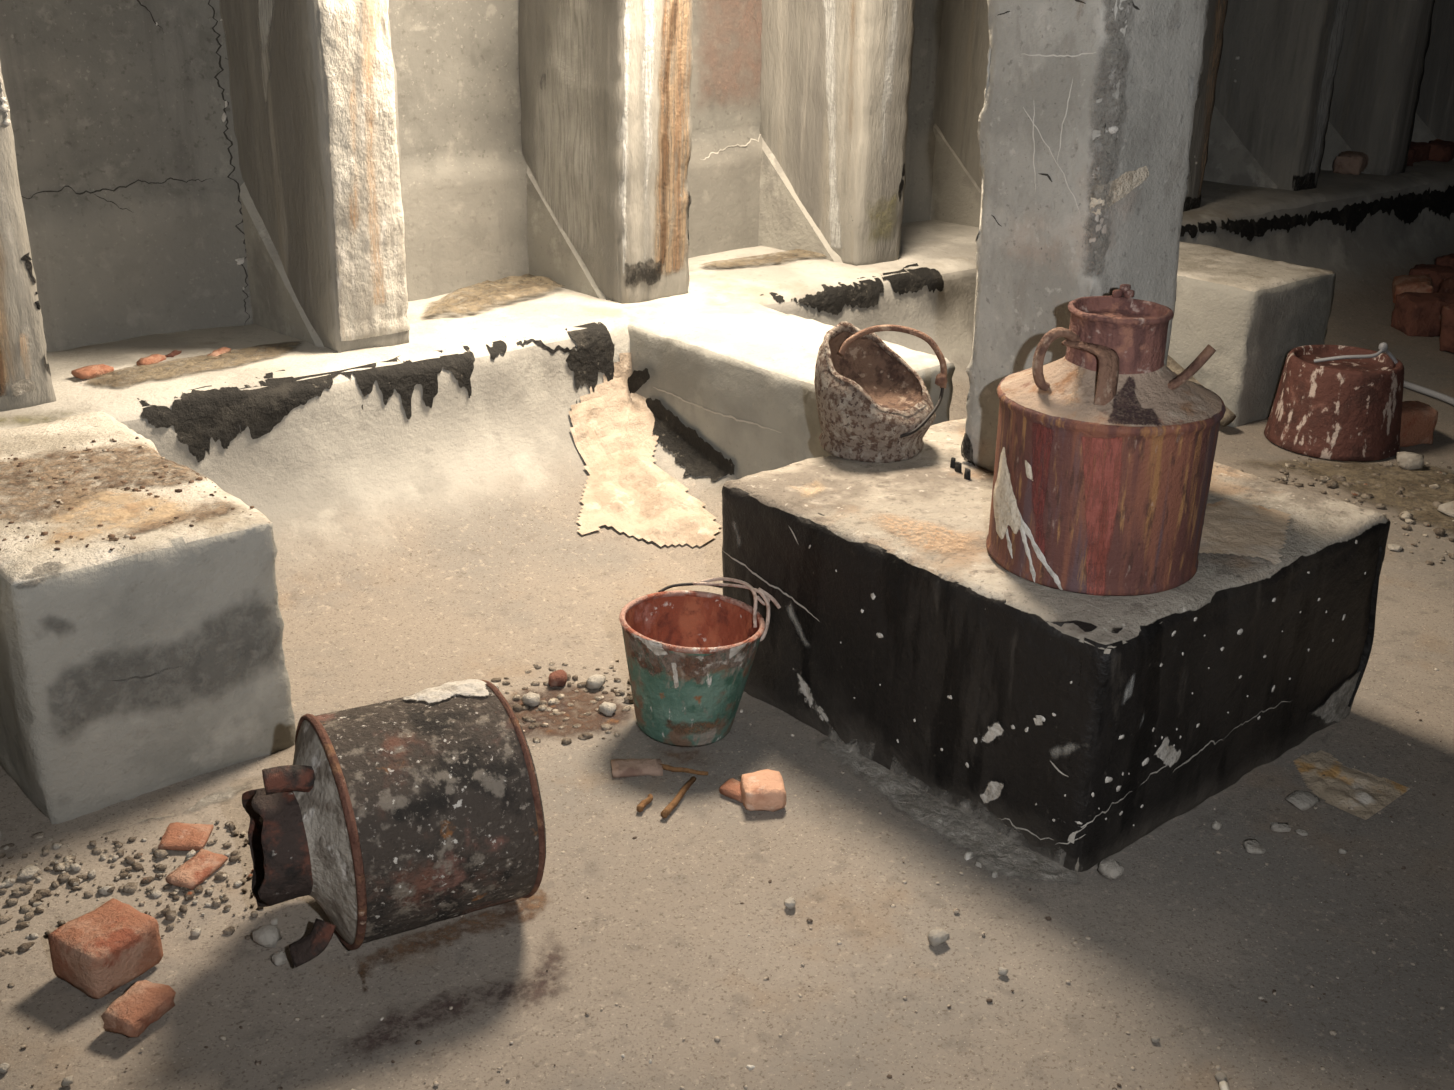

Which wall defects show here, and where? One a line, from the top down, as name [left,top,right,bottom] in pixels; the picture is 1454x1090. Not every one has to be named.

crack [21,0,250,323]
rust [655,0,691,274]
spalling [1085,0,1140,276]
rust [0,310,27,396]
peeling [486,337,577,360]
leakage [52,606,276,730]
crack [999,701,1291,845]